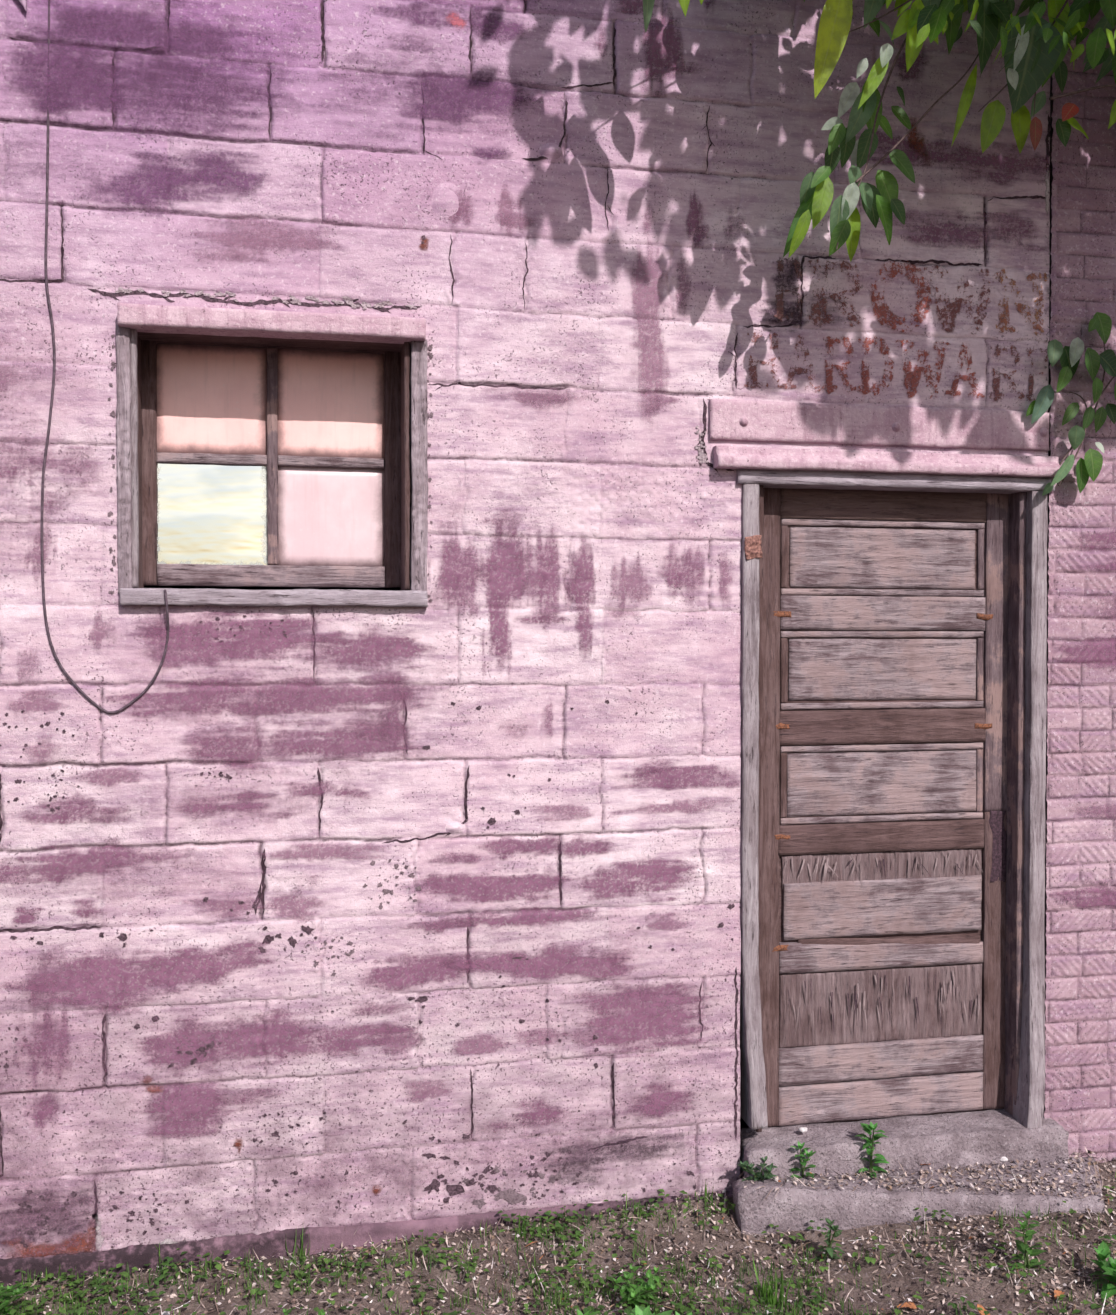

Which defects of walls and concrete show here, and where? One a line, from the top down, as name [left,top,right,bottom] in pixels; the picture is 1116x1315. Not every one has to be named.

damp [618,0,693,95]
damp [91,151,263,214]
crack [0,209,421,313]
crack [448,234,456,303]
damp [632,252,690,417]
crack [730,255,835,389]
crack [697,398,734,472]
damp [438,518,595,662]
damp [409,838,692,932]
damp [8,941,270,1082]
damp [367,946,704,1054]
damp [143,1003,420,1137]